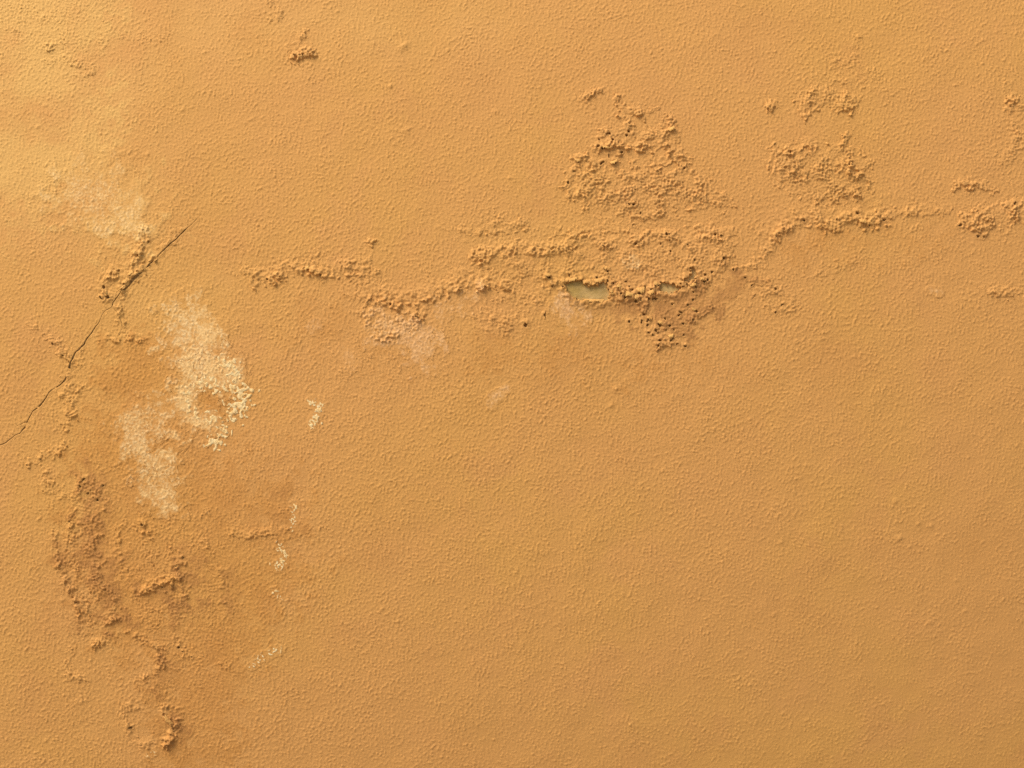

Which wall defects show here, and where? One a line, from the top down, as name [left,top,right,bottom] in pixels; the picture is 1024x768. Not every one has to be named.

crack [0,216,200,448]
peeling [236,219,742,320]
damp [22,191,979,768]